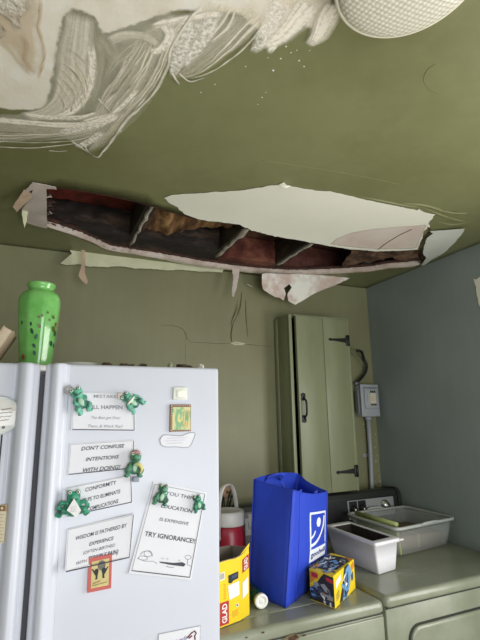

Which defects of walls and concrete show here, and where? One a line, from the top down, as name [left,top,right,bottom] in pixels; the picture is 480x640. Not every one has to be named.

peeling [47,182,464,275]